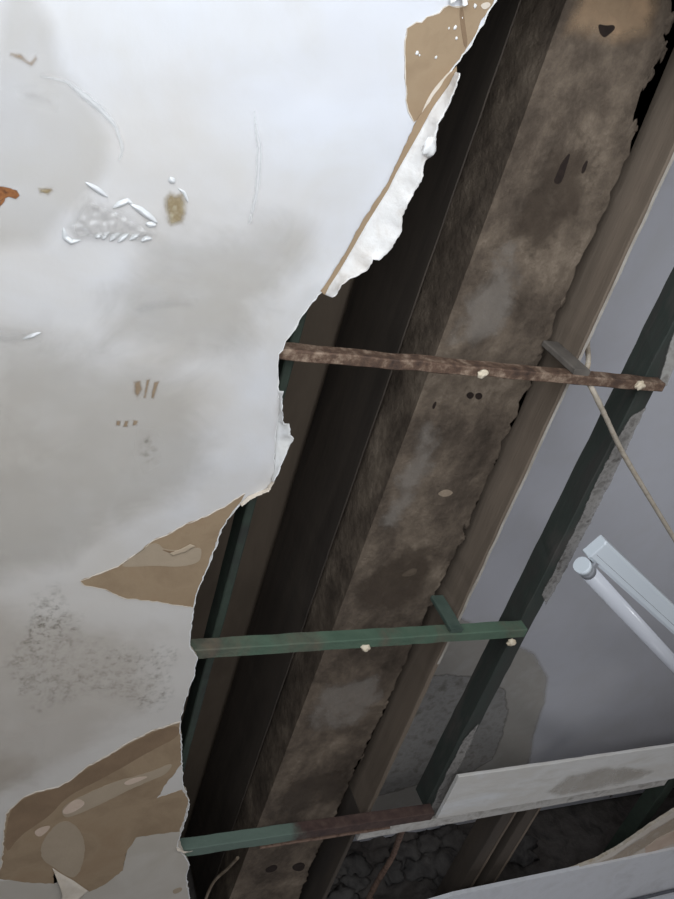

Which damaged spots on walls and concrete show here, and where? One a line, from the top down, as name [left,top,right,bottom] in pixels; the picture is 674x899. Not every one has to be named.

spalling [598,24,615,37]
spalling [643,11,674,90]
corrosion [0,186,19,206]
peeling [321,66,460,298]
spalling [554,154,570,184]
peeling [80,832,188,899]
peeling [0,880,62,899]